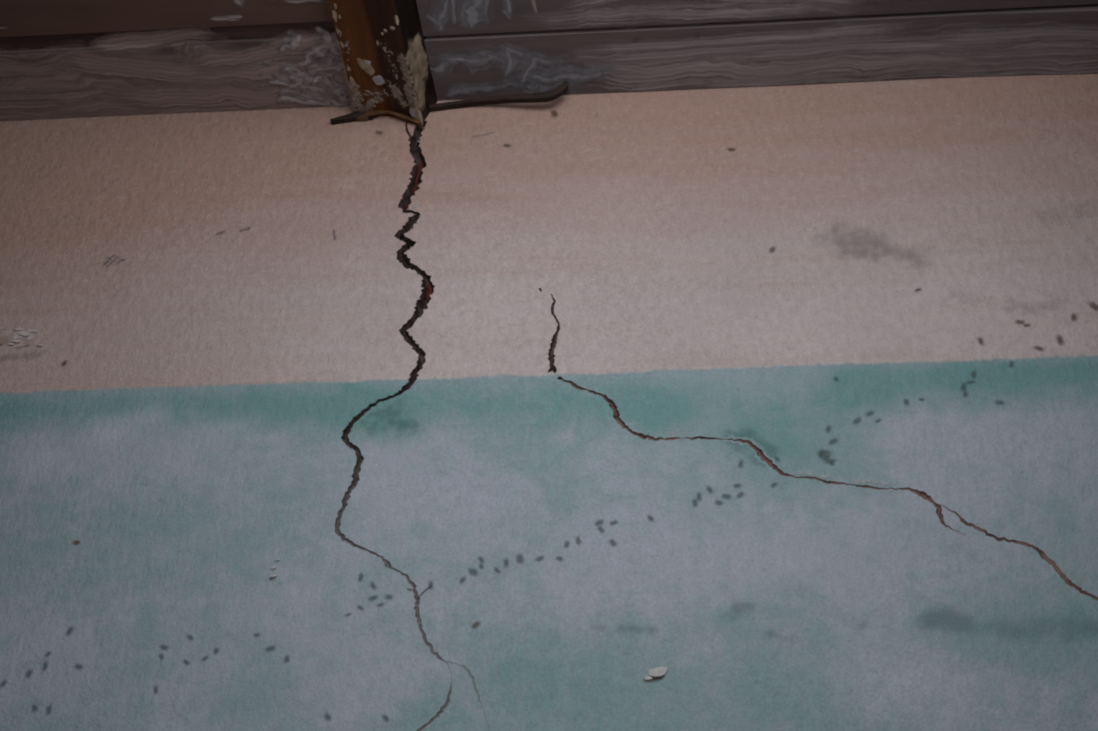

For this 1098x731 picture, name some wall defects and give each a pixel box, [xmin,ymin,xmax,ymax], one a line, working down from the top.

crack [335,121,490,731]
crack [538,288,1098,600]